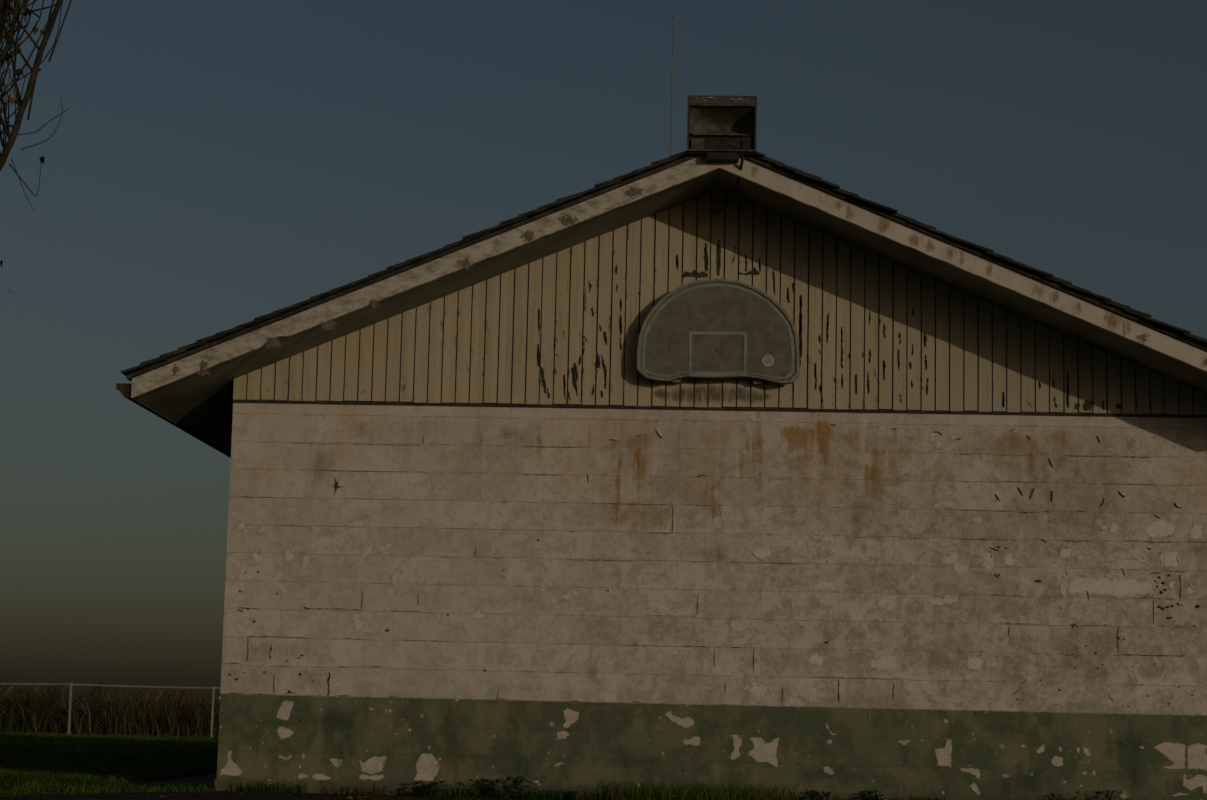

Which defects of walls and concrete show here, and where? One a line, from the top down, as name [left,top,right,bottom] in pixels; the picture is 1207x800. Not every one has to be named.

peeling [537,265,622,401]
peeling [1039,370,1152,411]
peeling [276,690,302,740]
peeling [550,708,579,740]
peeling [665,705,701,746]
peeling [219,750,242,777]
peeling [279,753,387,781]
peeling [414,745,441,782]
peeling [729,734,780,767]
peeling [898,738,981,798]
peeling [1020,744,1095,788]
peeling [1139,742,1207,796]